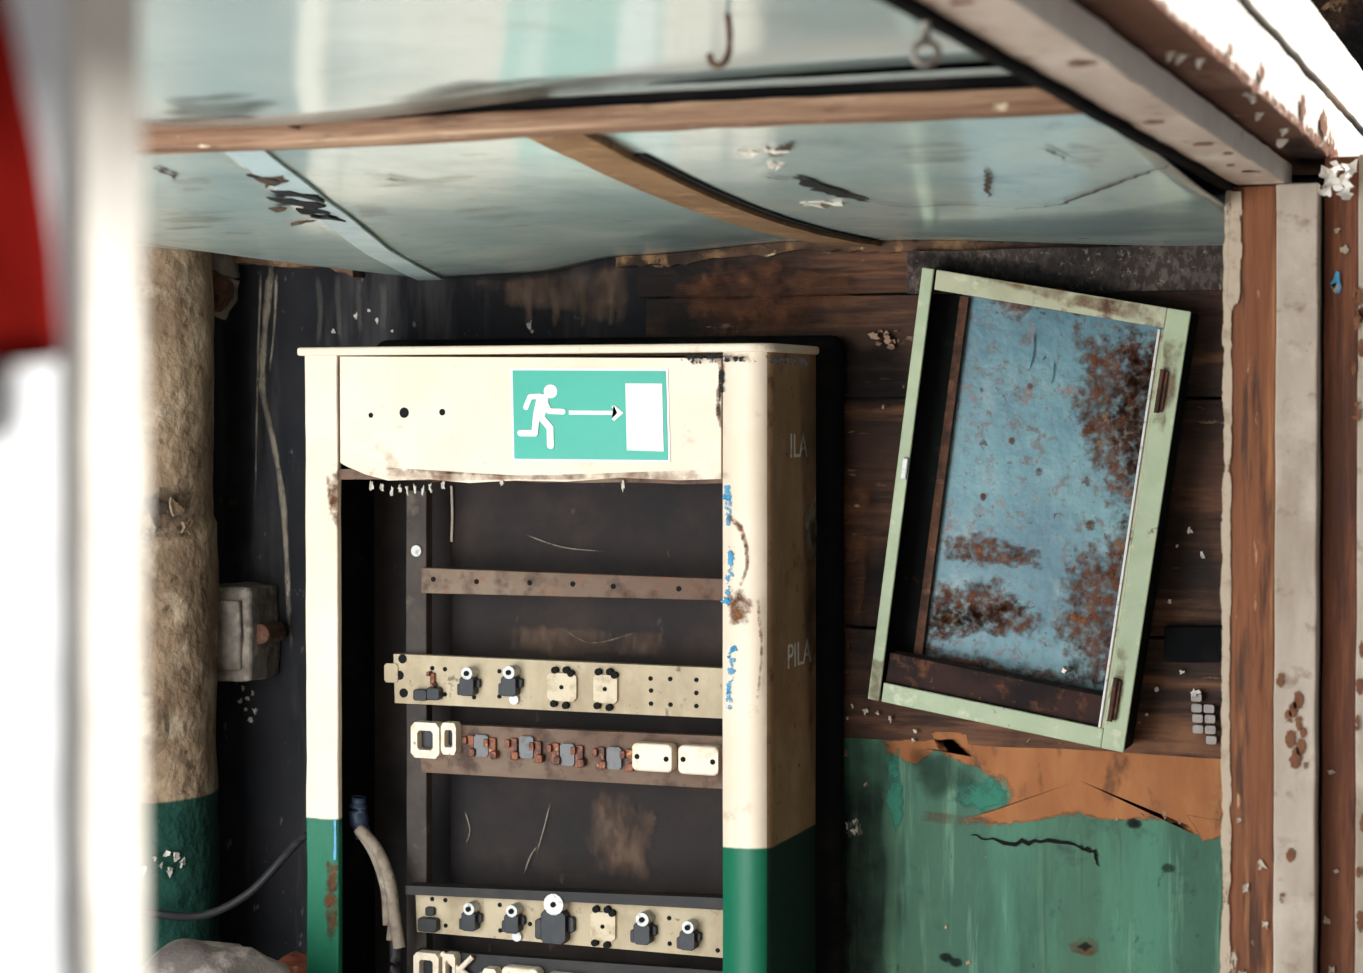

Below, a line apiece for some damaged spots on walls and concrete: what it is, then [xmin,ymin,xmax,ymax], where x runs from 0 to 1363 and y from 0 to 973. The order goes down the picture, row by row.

flaking render [1321,0,1349,12]
peeling [1152,0,1339,157]
peeling [868,329,899,350]
peeling [882,190,1249,973]
crack [971,834,1099,866]